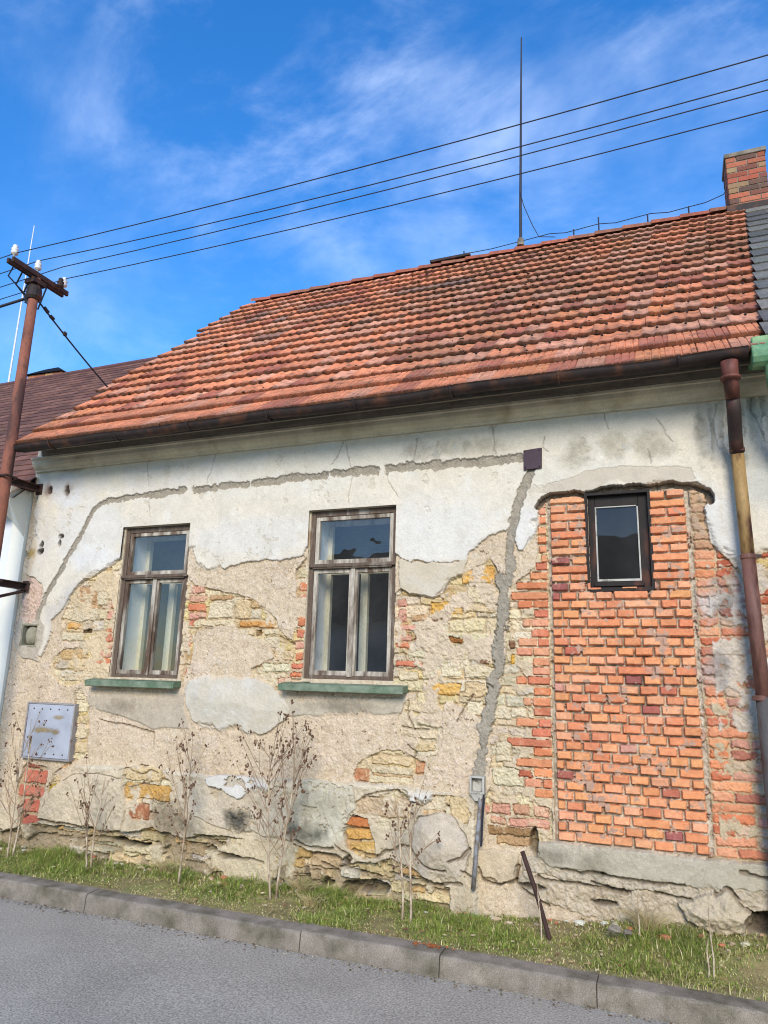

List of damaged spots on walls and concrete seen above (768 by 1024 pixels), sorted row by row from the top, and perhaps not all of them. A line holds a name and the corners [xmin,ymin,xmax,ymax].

hole [47,484,70,497]
crack [331,441,354,504]
hole [26,533,65,555]
crack [279,635,296,646]
flaking render [0,559,135,861]
flaking render [124,465,768,893]
peeling [404,883,450,911]
spalling [519,870,708,932]